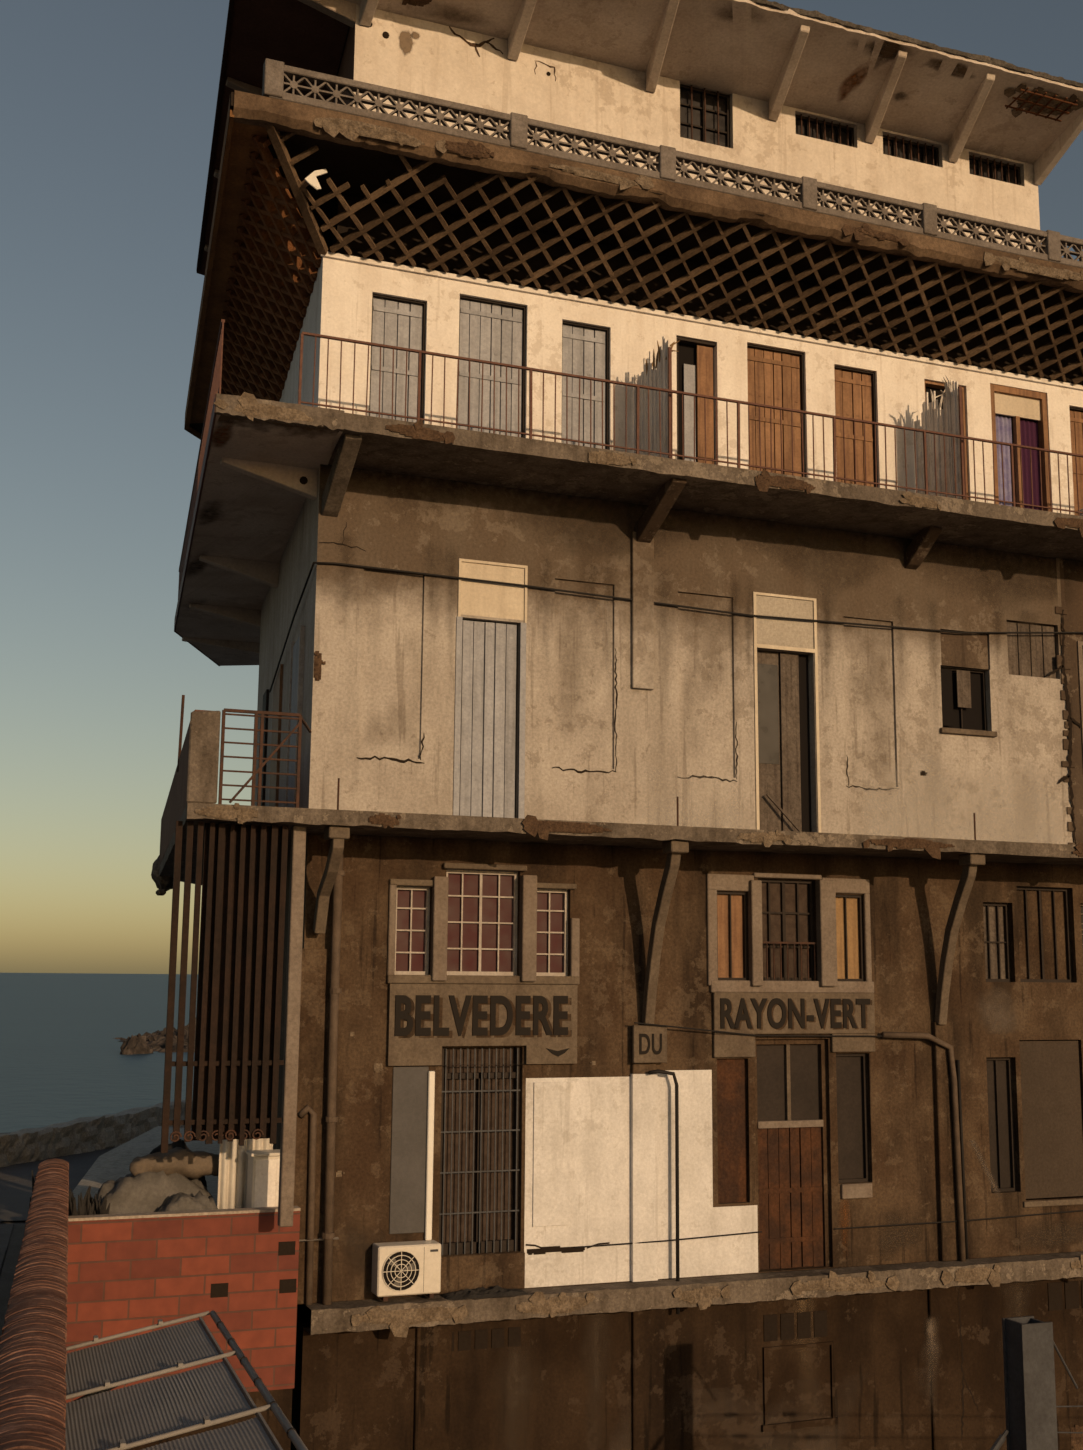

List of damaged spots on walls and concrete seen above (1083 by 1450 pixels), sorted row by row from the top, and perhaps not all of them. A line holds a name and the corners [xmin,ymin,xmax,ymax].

peeling [399,32,419,54]
crack [449,26,556,81]
spalling [1004,83,1083,122]
crack [552,649,618,773]
crack [357,735,425,764]
crack [678,722,738,782]
crack [526,1242,610,1255]